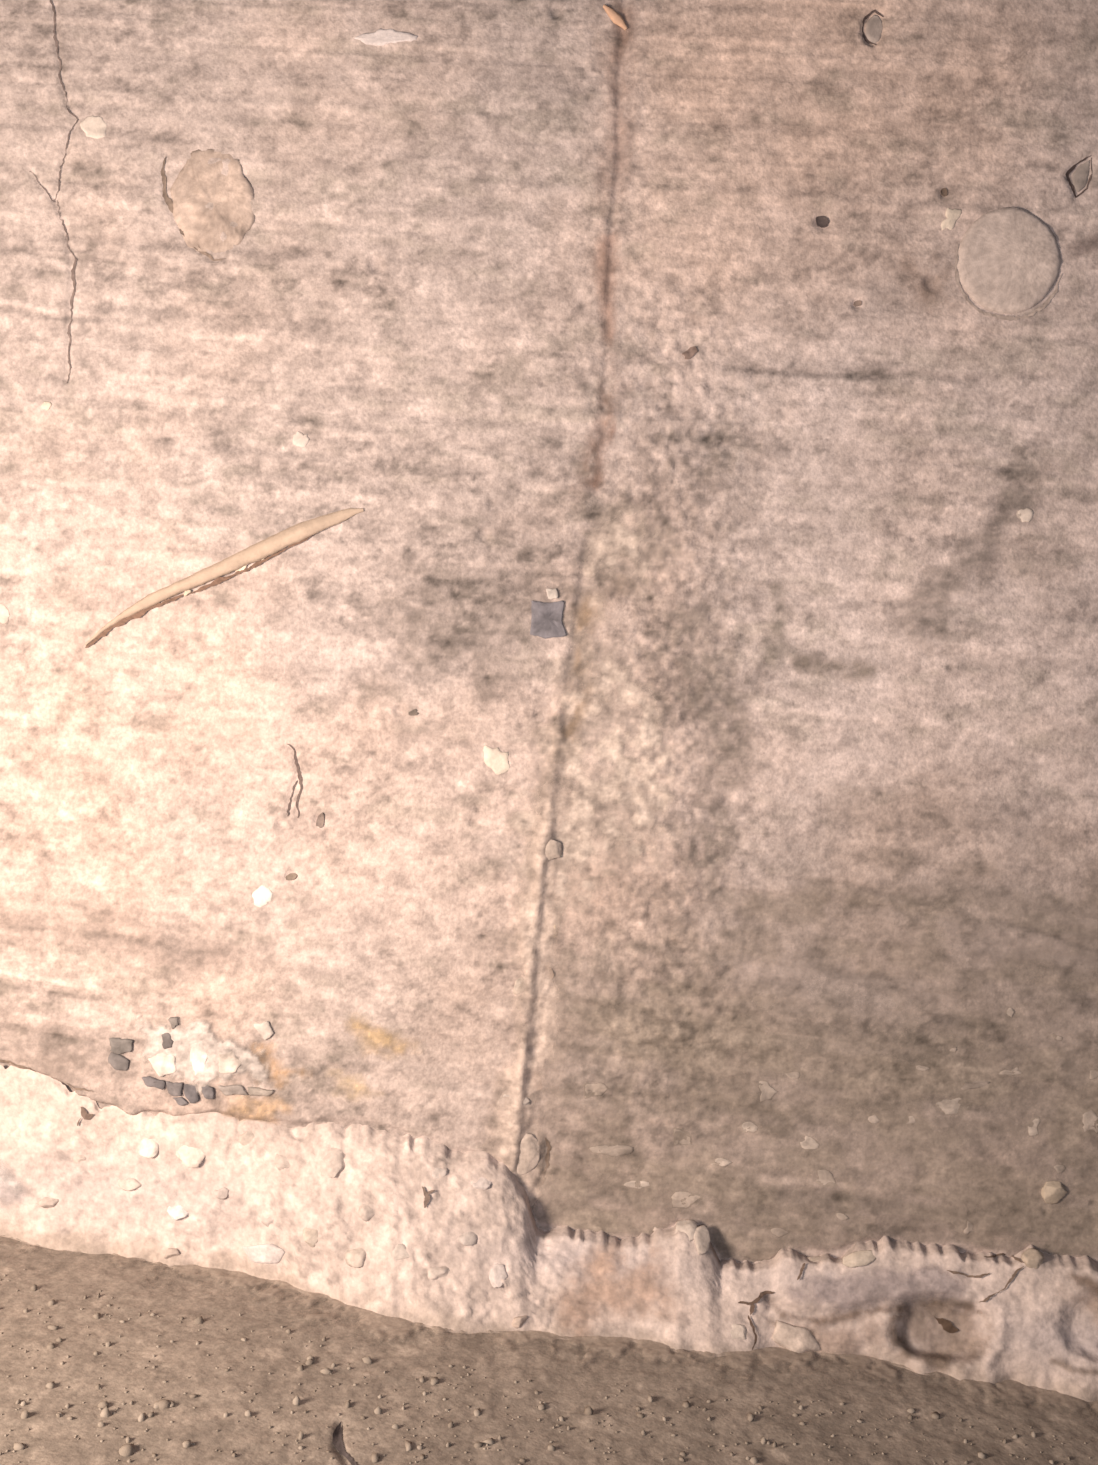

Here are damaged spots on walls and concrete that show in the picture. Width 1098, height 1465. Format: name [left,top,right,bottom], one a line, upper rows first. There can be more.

crack [30,0,78,382]
spalling [0,1016,1098,1413]
crack [738,1263,805,1350]
crack [816,1301,907,1323]
crack [947,1253,1024,1302]